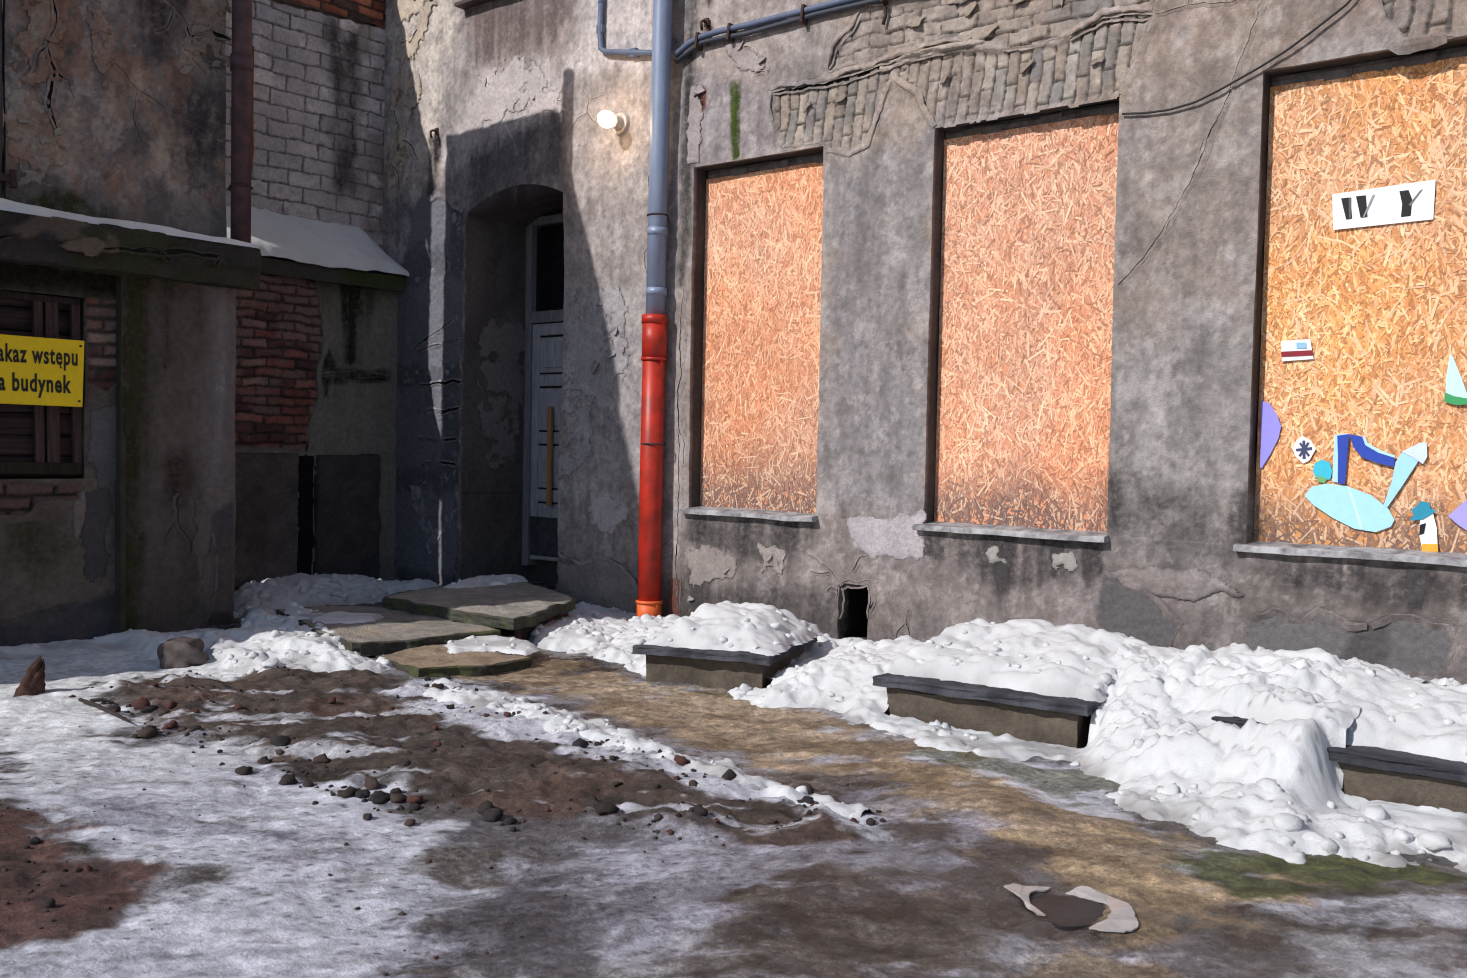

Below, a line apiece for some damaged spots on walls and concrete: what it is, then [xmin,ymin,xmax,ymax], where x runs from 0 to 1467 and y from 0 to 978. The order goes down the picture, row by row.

peeling [3,0,69,188]
water stain [330,25,358,191]
peeling [385,0,438,189]
peeling [686,84,705,164]
water stain [730,82,740,159]
peeling [725,39,766,73]
flaking render [767,0,1159,157]
crack [1116,0,1268,287]
flaking render [1357,0,1467,55]
flaking render [394,190,526,585]
peeling [847,509,927,561]